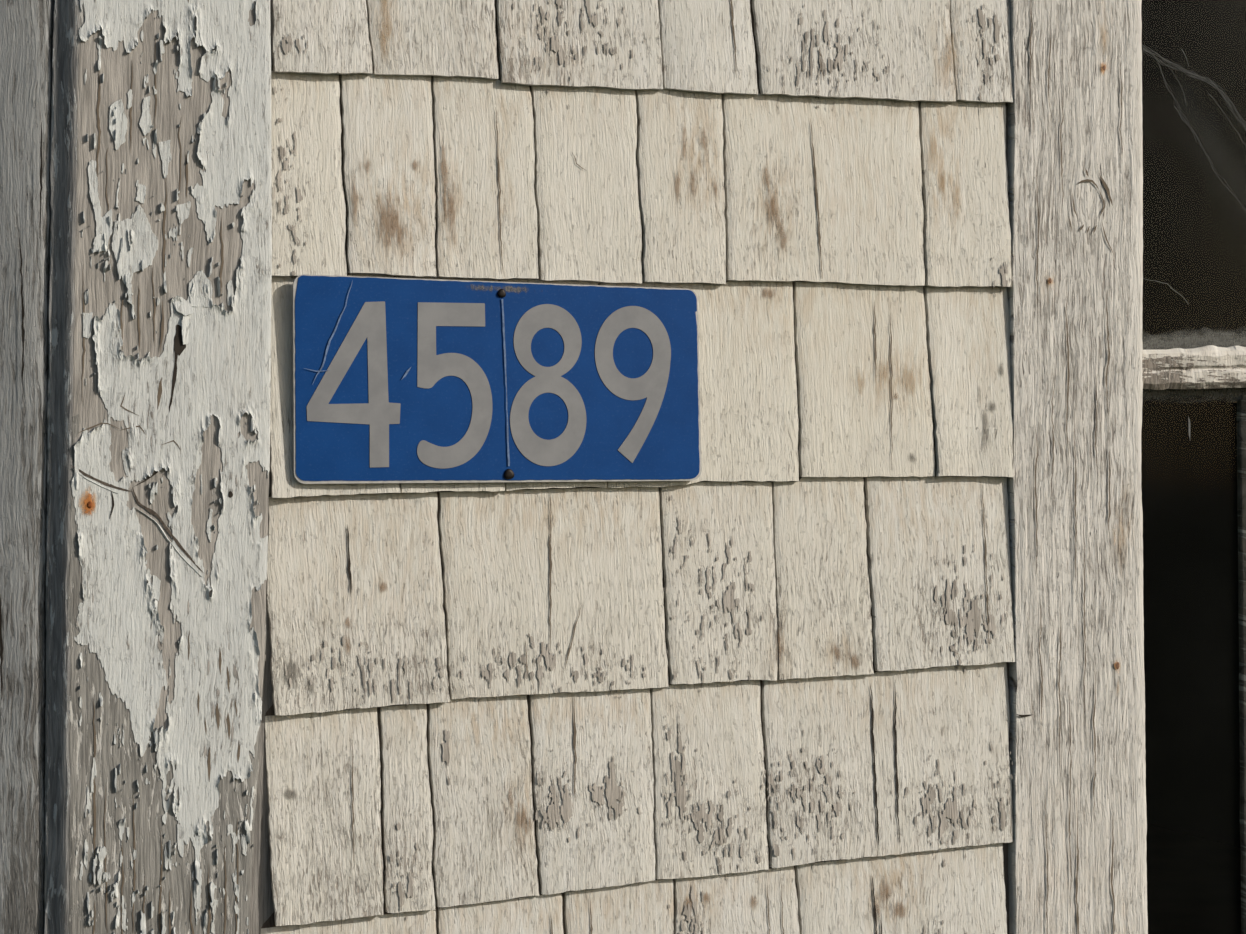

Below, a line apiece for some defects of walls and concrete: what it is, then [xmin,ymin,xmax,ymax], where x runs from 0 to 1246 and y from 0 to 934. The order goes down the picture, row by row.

peeling [248,1,256,26]
crack [218,219,226,296]
crack [71,37,203,577]
corrosion [81,491,95,514]
peeling [67,10,260,934]
peeling [245,460,269,538]